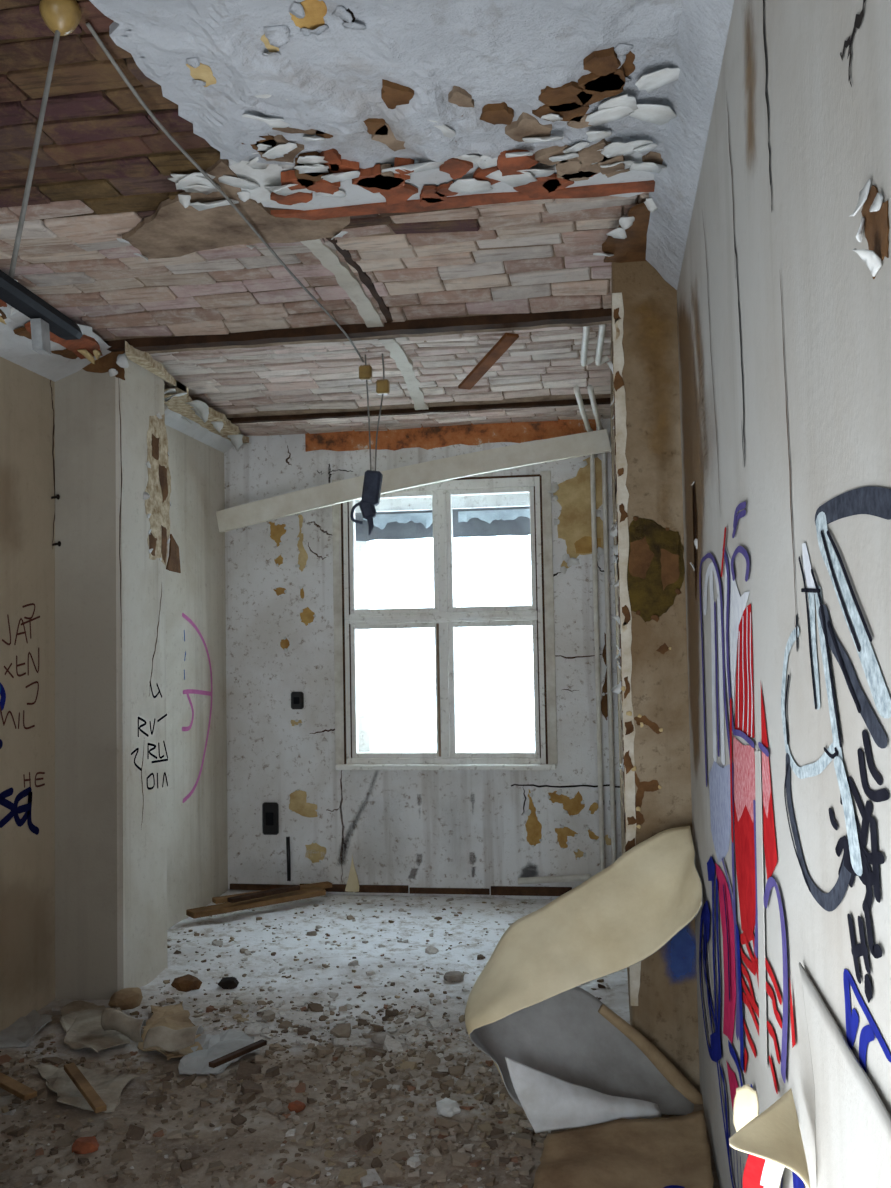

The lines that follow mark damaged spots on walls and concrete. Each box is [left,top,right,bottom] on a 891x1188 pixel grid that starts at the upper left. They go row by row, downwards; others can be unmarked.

flaking render [116,44,680,263]
crack [763,0,772,211]
crack [840,0,866,87]
spalling [0,299,32,340]
crack [702,95,745,504]
spalling [49,331,251,573]
peeling [525,293,663,860]
damp [627,300,707,768]
peeling [629,961,641,1006]